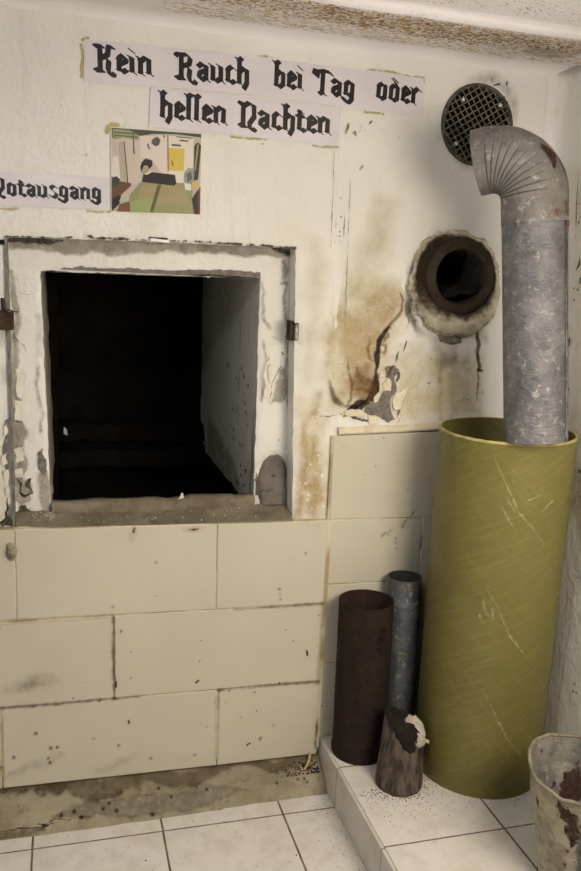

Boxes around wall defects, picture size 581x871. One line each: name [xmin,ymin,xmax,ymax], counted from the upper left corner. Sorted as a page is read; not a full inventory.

rust [226,0,581,51]
flaking render [0,270,51,527]
crack [321,327,407,417]
flaking render [343,365,408,424]
water stain [346,295,417,402]